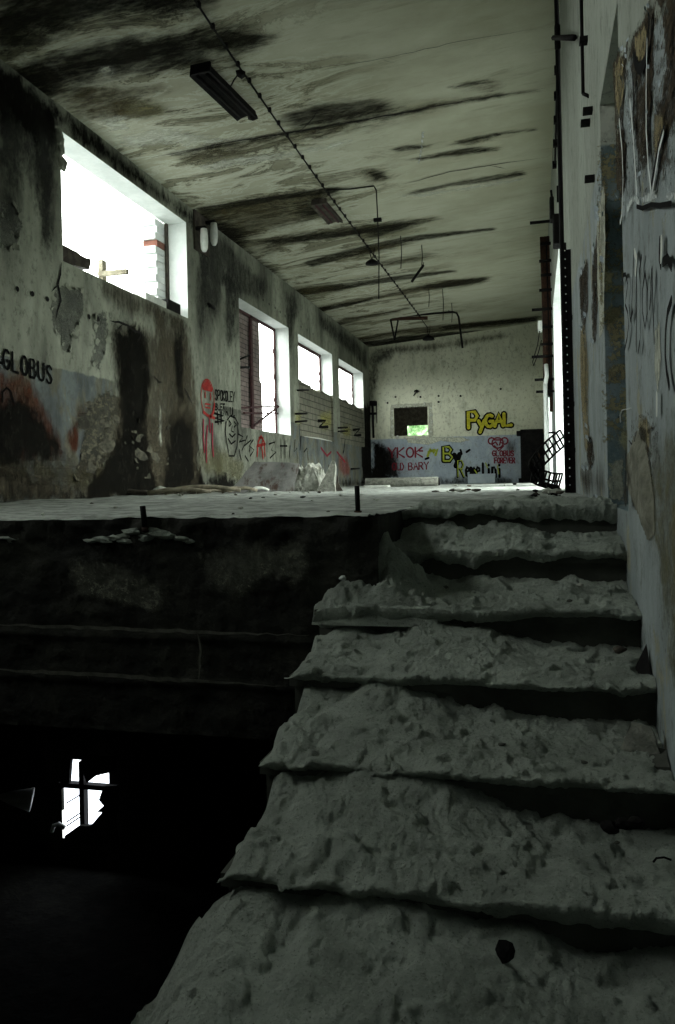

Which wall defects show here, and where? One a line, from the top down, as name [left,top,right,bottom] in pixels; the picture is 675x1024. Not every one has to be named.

peeling [51,283,112,370]
water stain [0,0,536,503]
peeling [578,0,675,500]